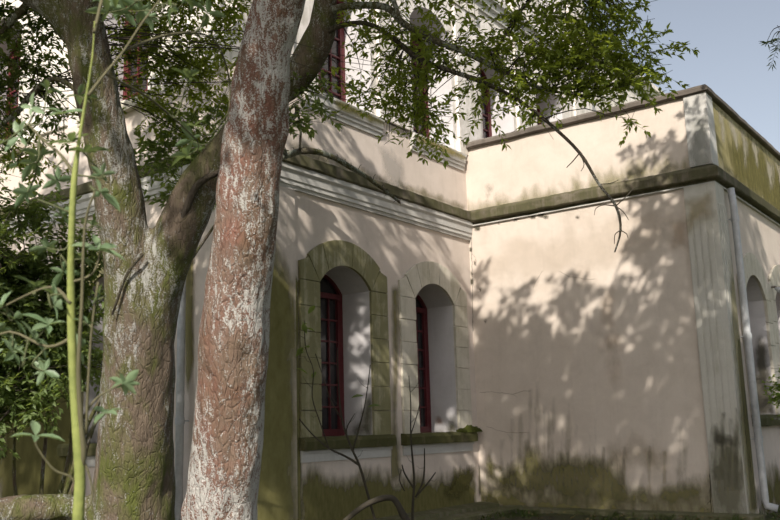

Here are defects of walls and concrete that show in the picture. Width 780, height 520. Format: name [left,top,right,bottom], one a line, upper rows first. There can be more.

water stain [719,113,757,162]
water stain [444,468,474,497]
water stain [712,435,742,514]